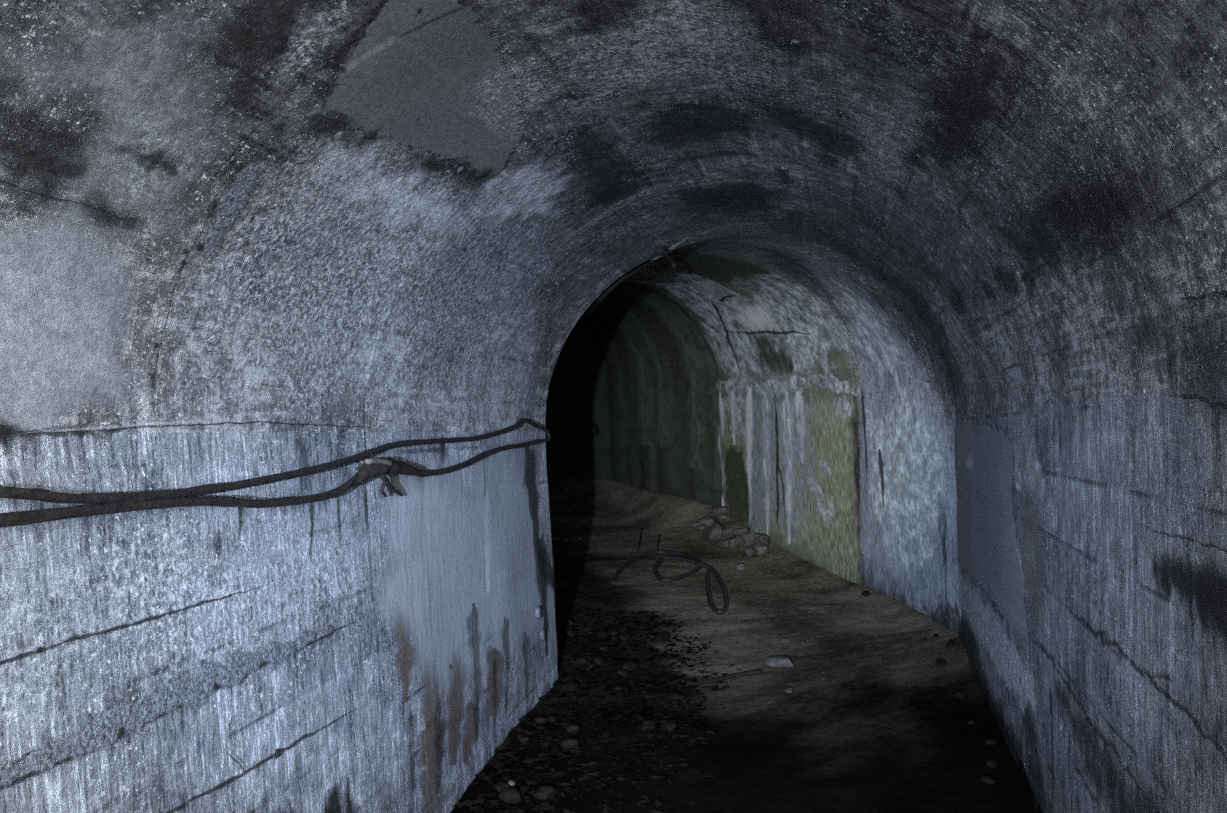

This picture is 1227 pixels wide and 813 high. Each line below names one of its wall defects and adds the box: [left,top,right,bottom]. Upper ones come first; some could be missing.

water stain [0,36,206,444]
water stain [601,226,1150,813]
crack [0,586,261,665]
water stain [324,777,353,813]
rust [395,609,504,813]
crack [1028,633,1160,813]
crack [1060,600,1227,764]